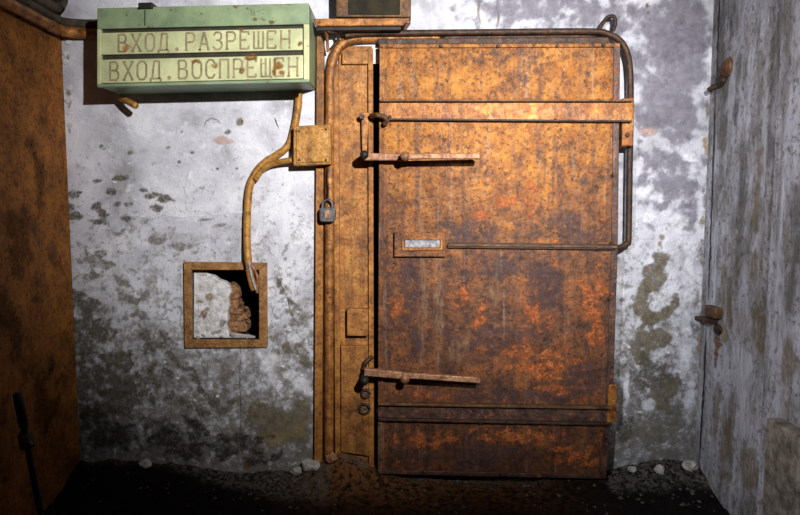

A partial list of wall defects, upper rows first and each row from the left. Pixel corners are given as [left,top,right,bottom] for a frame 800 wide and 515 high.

damp [77,250,116,279]
damp [149,228,192,251]
damp [476,0,800,459]
damp [119,280,150,320]
rust [580,276,609,346]
damp [72,289,313,466]
rust [492,337,586,400]
rust [469,427,598,467]